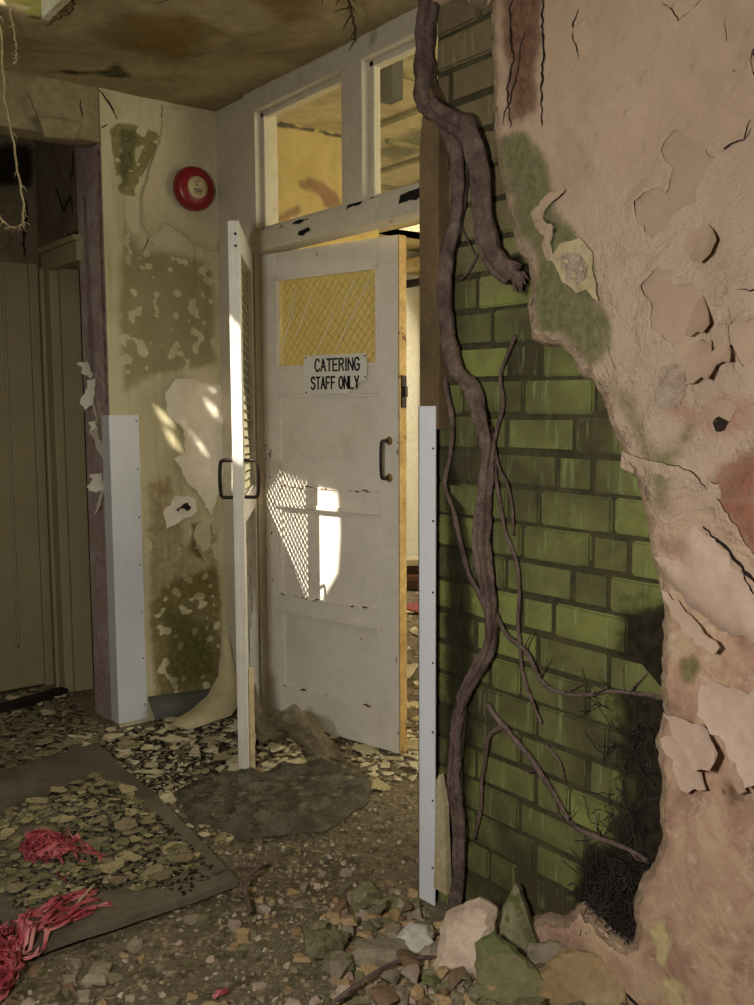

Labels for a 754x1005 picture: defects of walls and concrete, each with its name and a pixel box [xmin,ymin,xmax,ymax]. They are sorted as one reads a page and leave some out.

crack [97,88,123,128]
damp [511,254,530,294]
peeling [163,378,223,529]
spalling [436,0,754,1005]
damp [151,570,221,695]